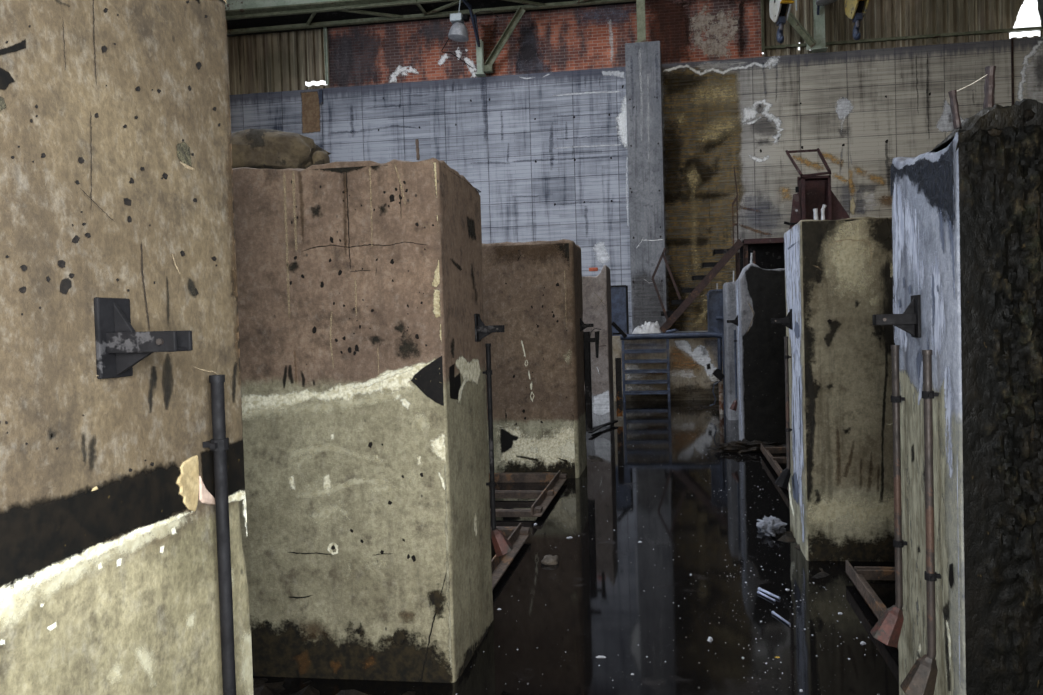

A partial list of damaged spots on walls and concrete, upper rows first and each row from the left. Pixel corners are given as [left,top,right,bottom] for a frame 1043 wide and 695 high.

efflorescence [389,65,419,83]
water stain [599,22,637,226]
crack [304,172,425,272]
water stain [622,6,784,434]
rust [793,154,892,214]
spalling [46,260,74,294]
spalling [333,293,374,355]
spalling [407,260,442,342]
water stain [593,391,610,415]
water stain [774,183,960,695]
peeling [177,455,215,511]
spalling [431,434,452,668]